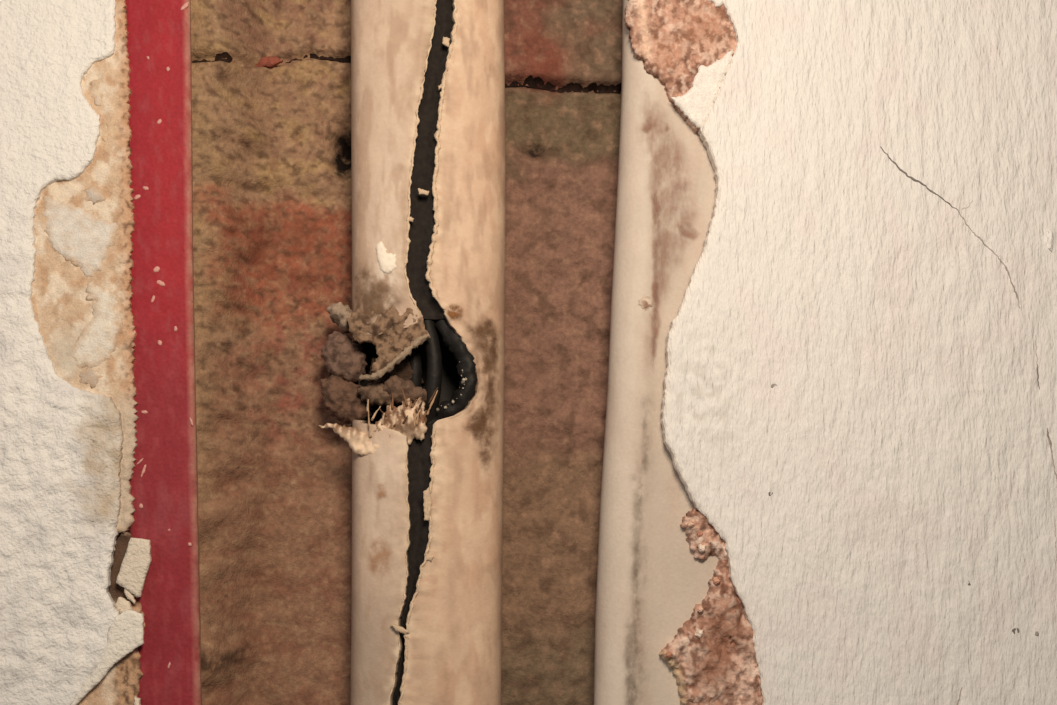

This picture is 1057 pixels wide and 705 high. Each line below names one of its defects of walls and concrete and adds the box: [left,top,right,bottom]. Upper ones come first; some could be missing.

flaking render [624,0,737,134]
peeling [375,241,397,274]
crack [880,146,1020,308]
flaking render [31,0,152,705]
crack [1047,428,1057,480]
flaking render [659,508,763,705]